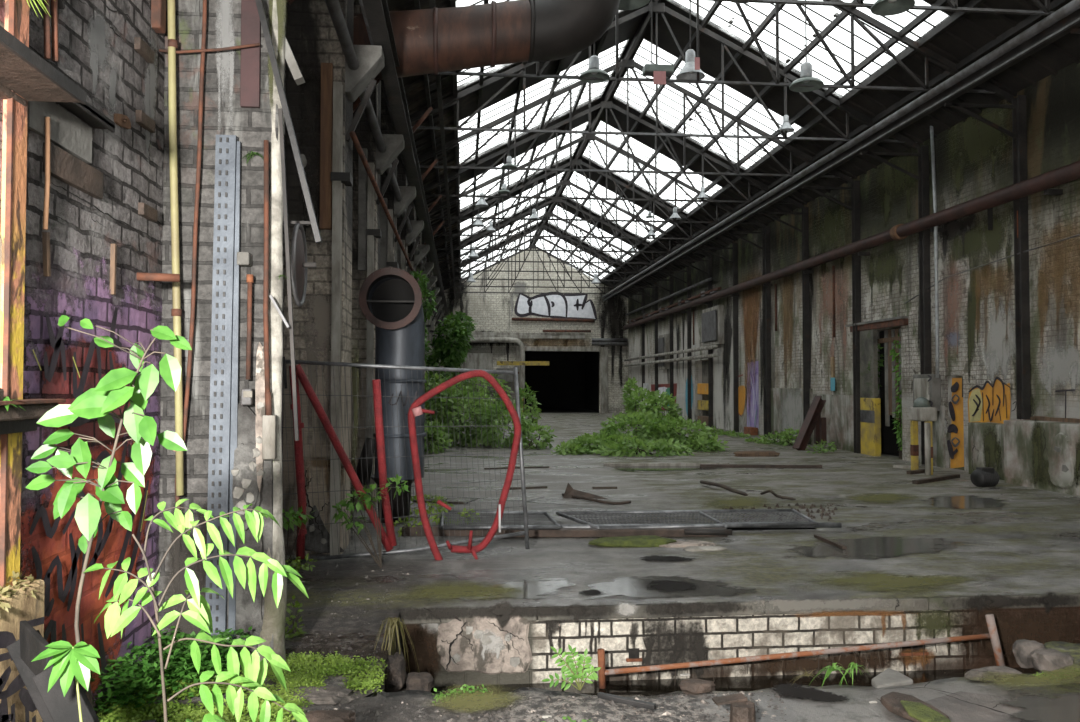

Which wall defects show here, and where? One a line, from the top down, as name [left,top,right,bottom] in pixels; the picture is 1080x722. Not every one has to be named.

rust [741,276,760,407]
leakage [939,214,979,291]
rust [1038,221,1080,354]
crack [440,617,522,670]